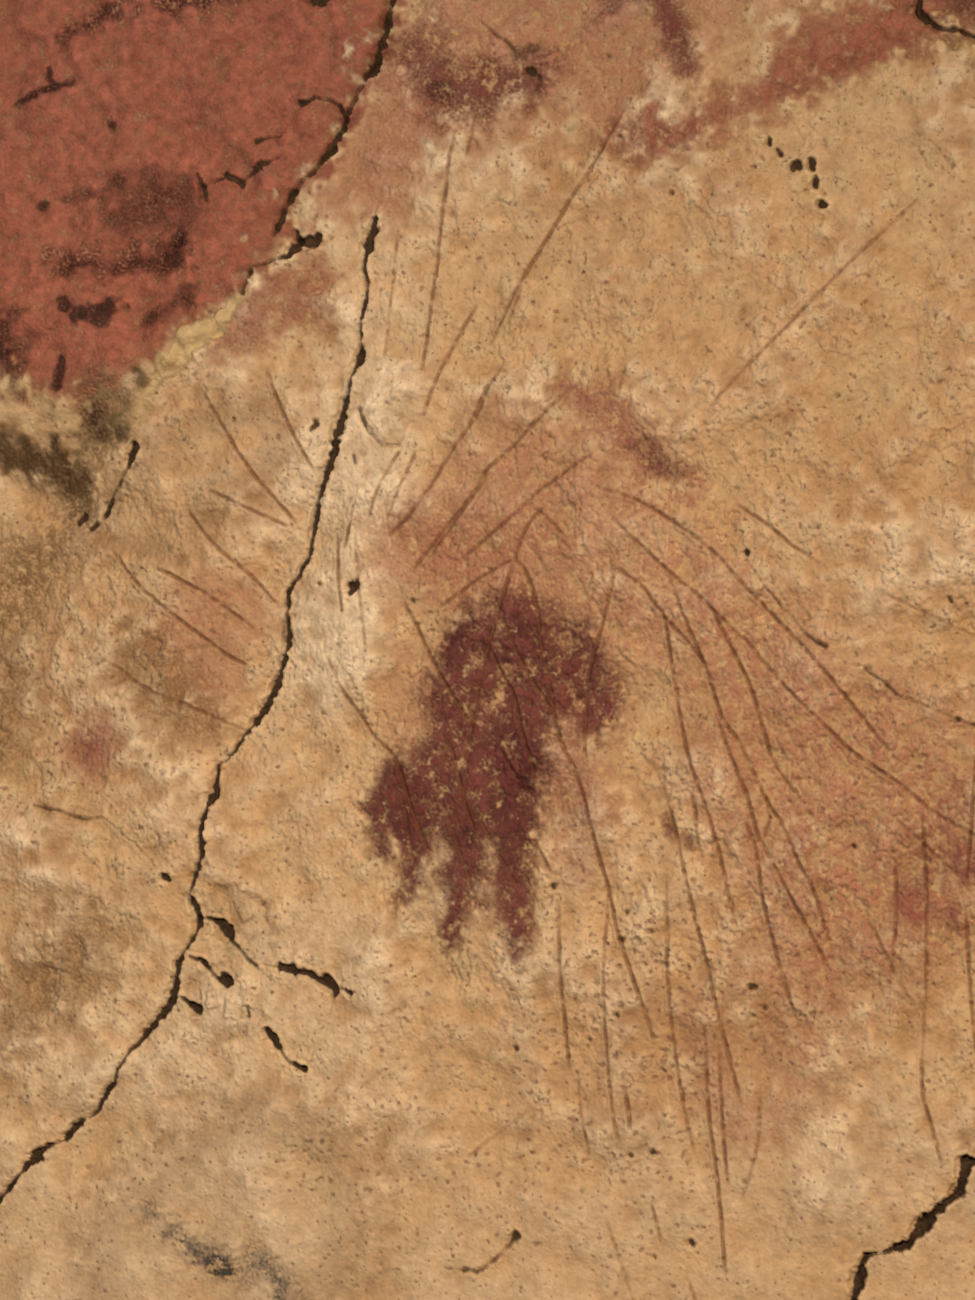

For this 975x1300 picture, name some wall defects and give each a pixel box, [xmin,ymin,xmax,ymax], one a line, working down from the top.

crack [915,0,975,39]
crack [196,137,271,198]
crack [241,0,396,295]
crack [0,216,379,1203]
crack [463,1231,521,1273]
crack [851,1155,975,1300]